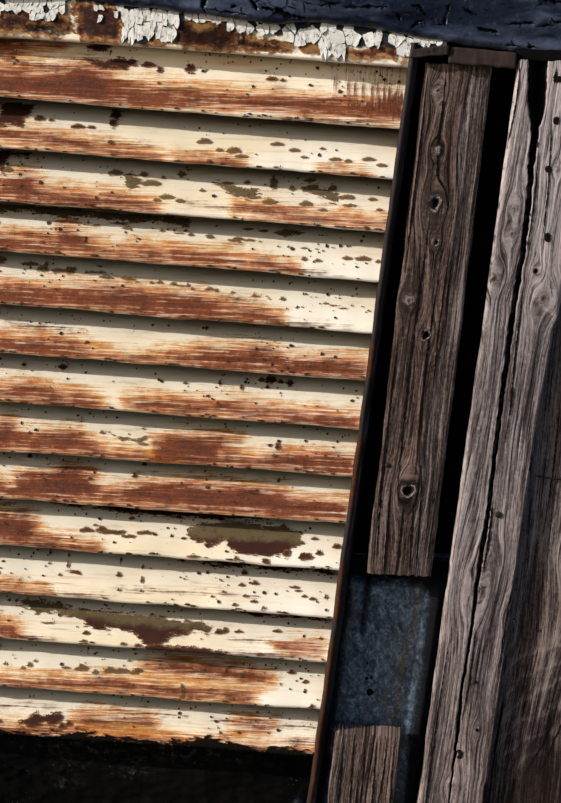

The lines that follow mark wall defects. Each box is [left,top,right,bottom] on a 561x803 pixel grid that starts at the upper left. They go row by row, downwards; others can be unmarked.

peeling [0,0,67,21]
rust [0,0,408,127]
peeling [84,5,443,84]
peeling [288,177,356,211]
rust [0,219,326,275]
rust [0,273,329,326]
rust [0,325,374,380]
crack [201,0,561,803]
rust [0,387,362,552]
peeling [50,502,336,624]
peeling [8,596,243,656]
rust [0,638,334,803]